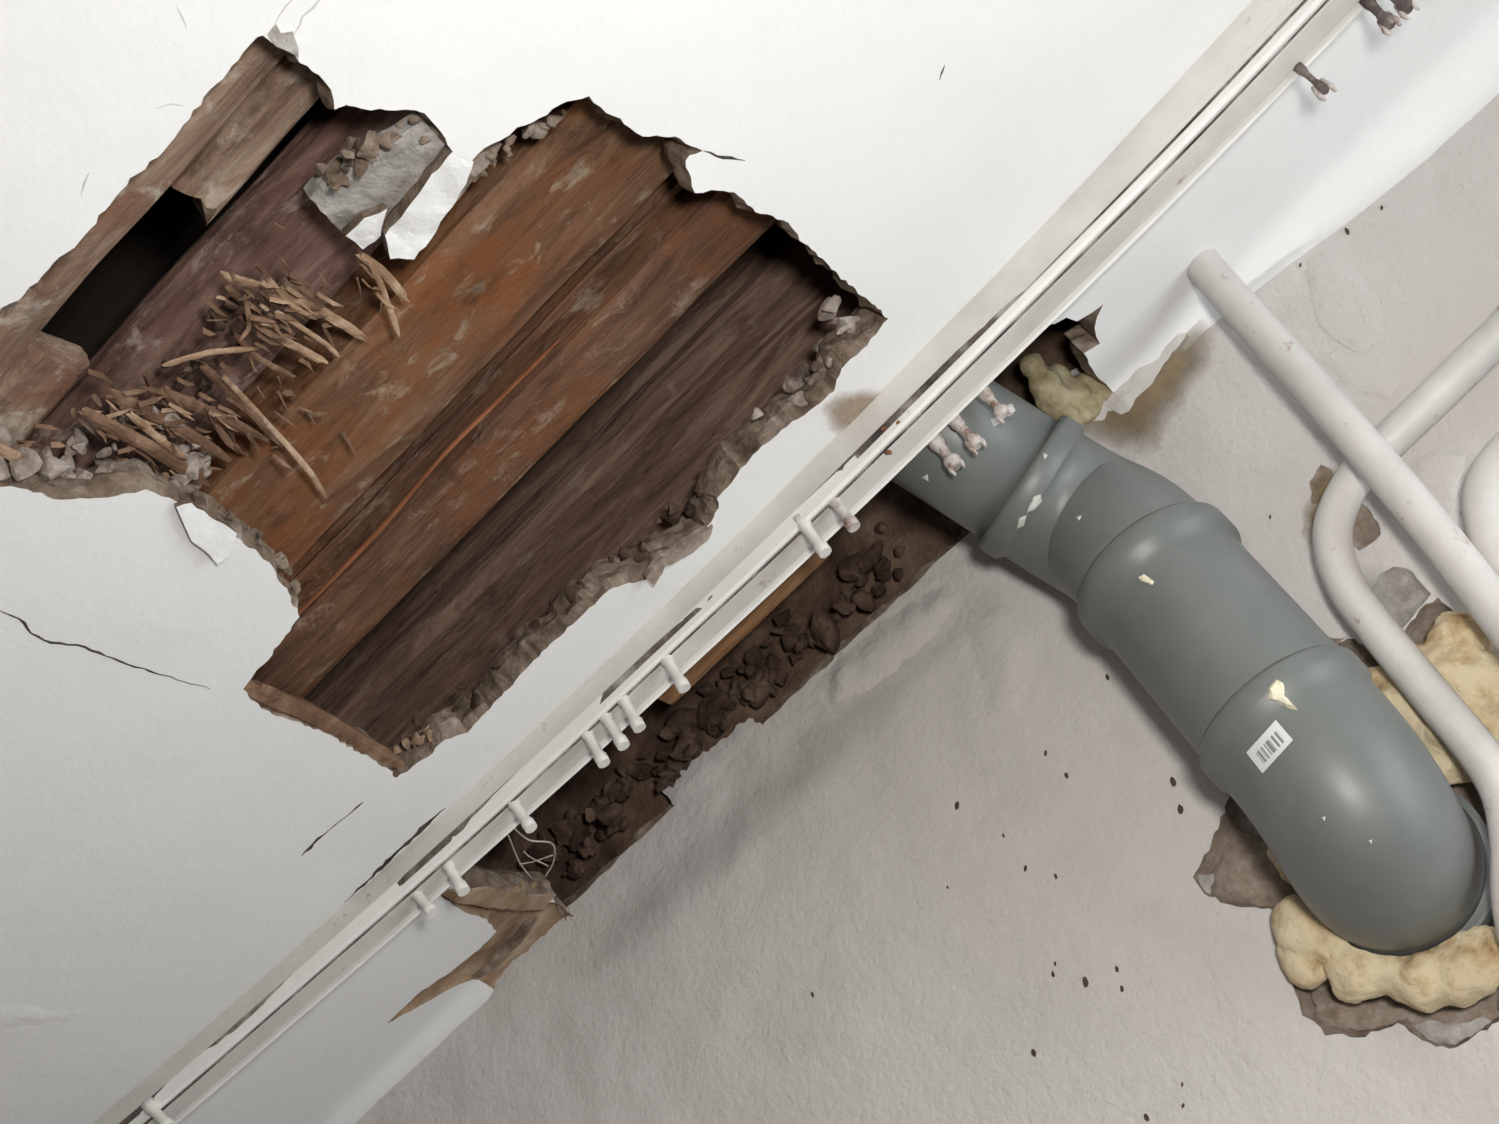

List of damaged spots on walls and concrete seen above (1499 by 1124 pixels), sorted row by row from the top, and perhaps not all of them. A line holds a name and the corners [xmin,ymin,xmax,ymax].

peeling [267,25,299,57]
crack [273,0,320,60]
peeling [448,141,502,212]
peeling [174,499,237,564]
peeling [644,524,713,586]
spalling [1353,504,1381,551]
spalling [1372,567,1454,644]
crack [0,610,210,689]
spalling [1329,637,1380,668]
spalling [1450,782,1487,826]
spalling [1193,796,1298,910]
spalling [1292,979,1499,1049]